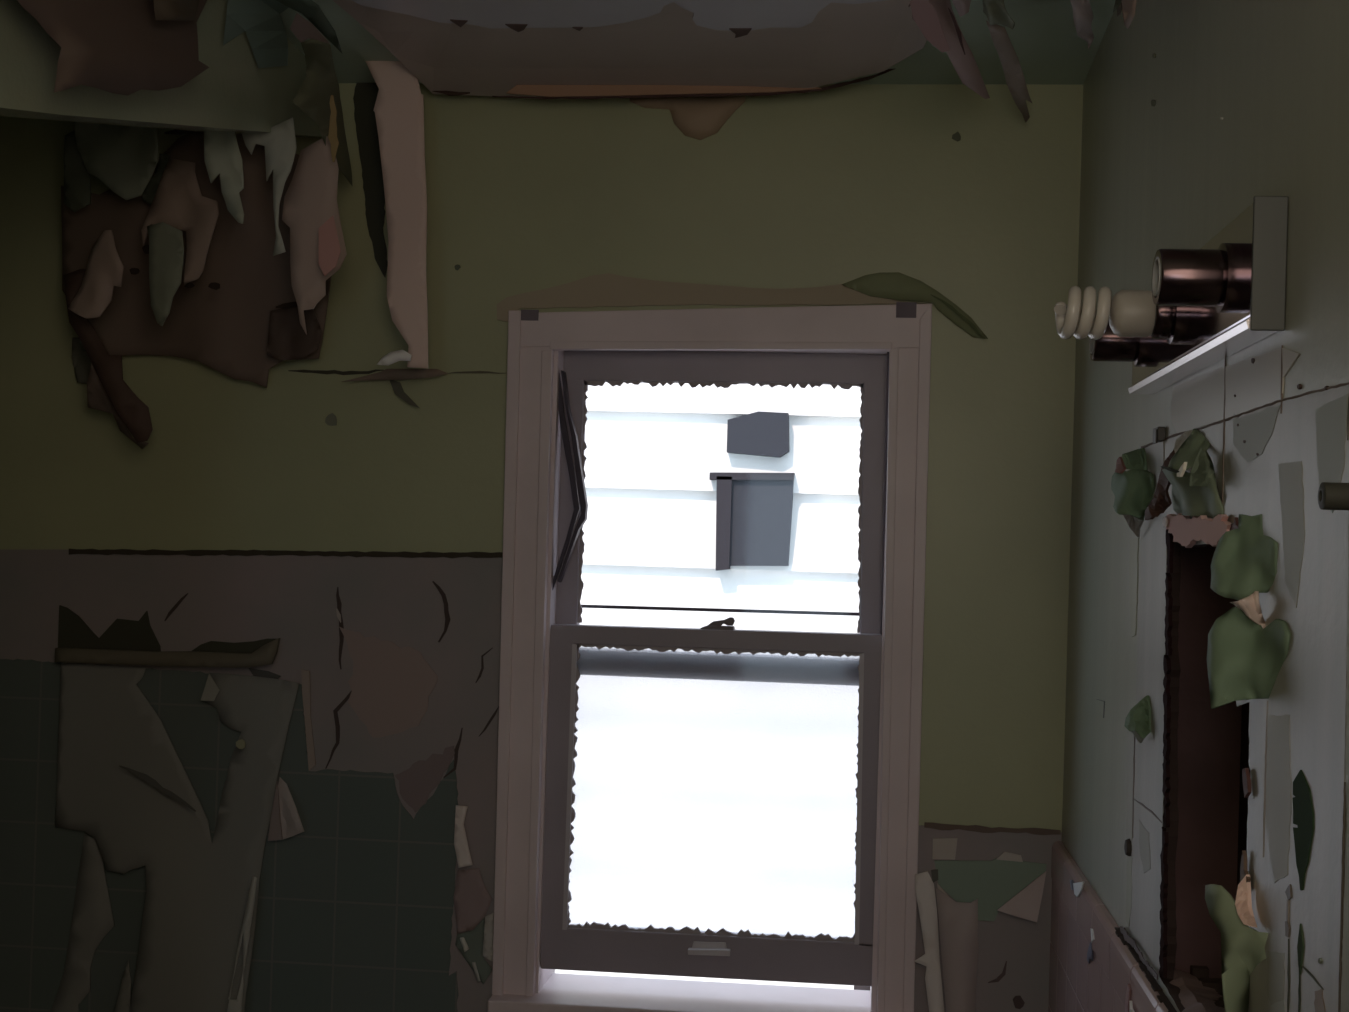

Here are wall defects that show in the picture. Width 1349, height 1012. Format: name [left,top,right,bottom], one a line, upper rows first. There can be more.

peeling [17,0,209,96]
peeling [342,61,448,382]
crack [432,581,451,642]
crack [325,587,352,769]
crack [443,706,499,778]
crack [475,647,493,683]
peeling [1130,385,1349,1012]